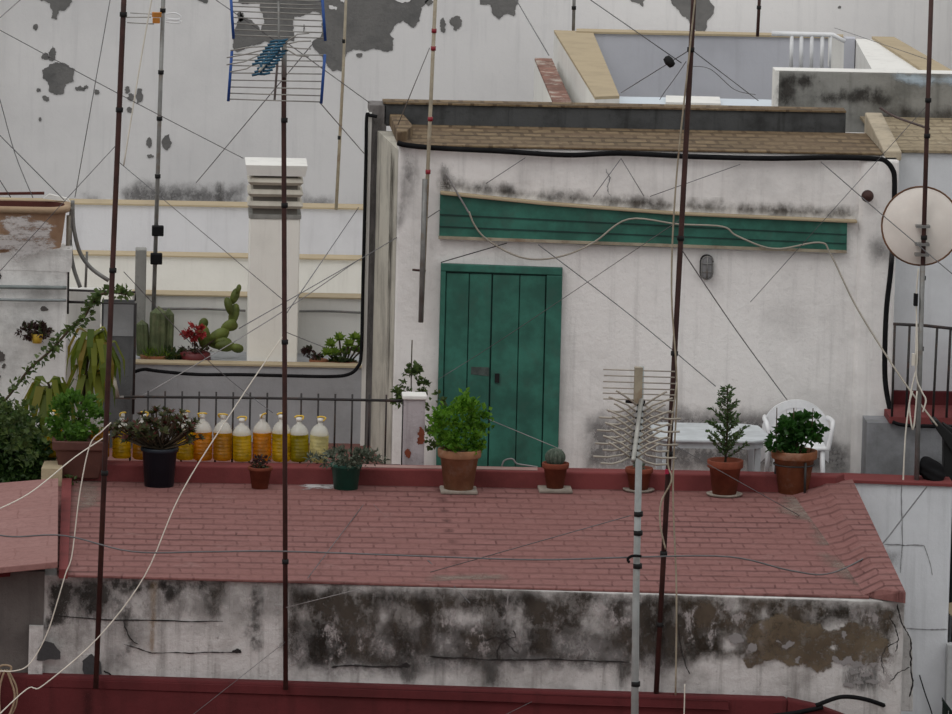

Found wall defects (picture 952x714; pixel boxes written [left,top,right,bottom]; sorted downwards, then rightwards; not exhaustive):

peeling [41,0,72,20]
peeling [233,0,433,71]
peeling [440,16,462,33]
peeling [480,0,518,19]
peeling [671,0,714,31]
peeling [36,47,100,102]
water stain [779,75,810,104]
water stain [821,87,888,104]
peeling [0,216,56,262]
water stain [288,584,896,681]
peeling [728,614,892,689]